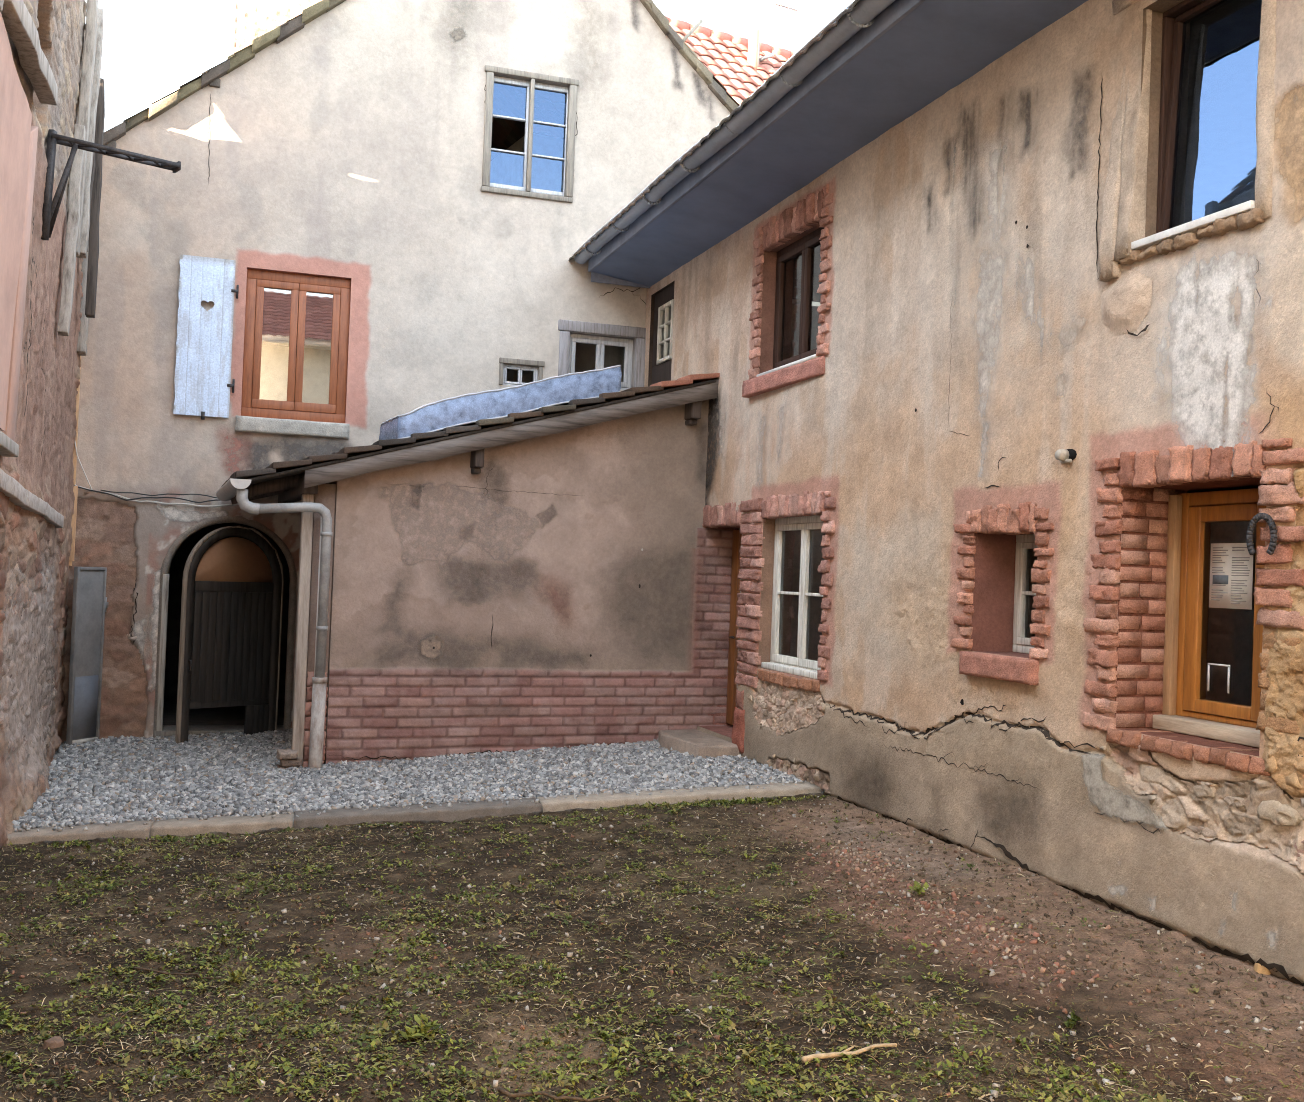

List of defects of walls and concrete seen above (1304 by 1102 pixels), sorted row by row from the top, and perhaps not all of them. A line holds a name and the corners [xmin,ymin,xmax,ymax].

water stain [945,112,1006,238]
water stain [1020,93,1031,148]
water stain [1070,72,1091,177]
water stain [977,254,1003,471]
peeling [1157,252,1270,477]
flaking render [749,676,825,735]
flaking render [767,754,830,791]
crack [829,704,1099,793]
flaking render [1099,465,1304,876]